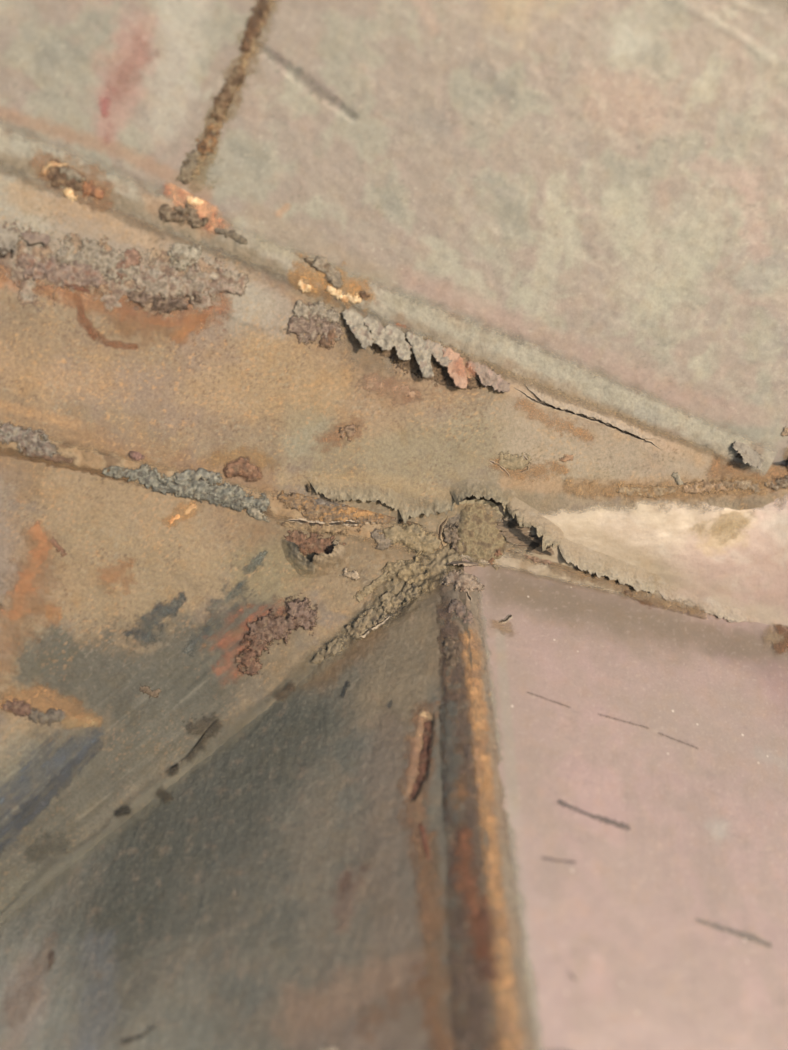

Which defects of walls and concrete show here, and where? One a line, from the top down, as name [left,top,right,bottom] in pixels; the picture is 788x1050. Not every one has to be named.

rust [159,0,275,244]
rust [33,154,112,208]
rust [0,220,249,342]
rust [283,255,392,371]
peeling [342,306,510,392]
crack [512,380,665,450]
rust [0,422,271,527]
rust [565,440,788,502]
peeling [507,497,763,623]
rust [218,593,319,676]
rust [0,686,101,727]
rust [311,515,522,1050]